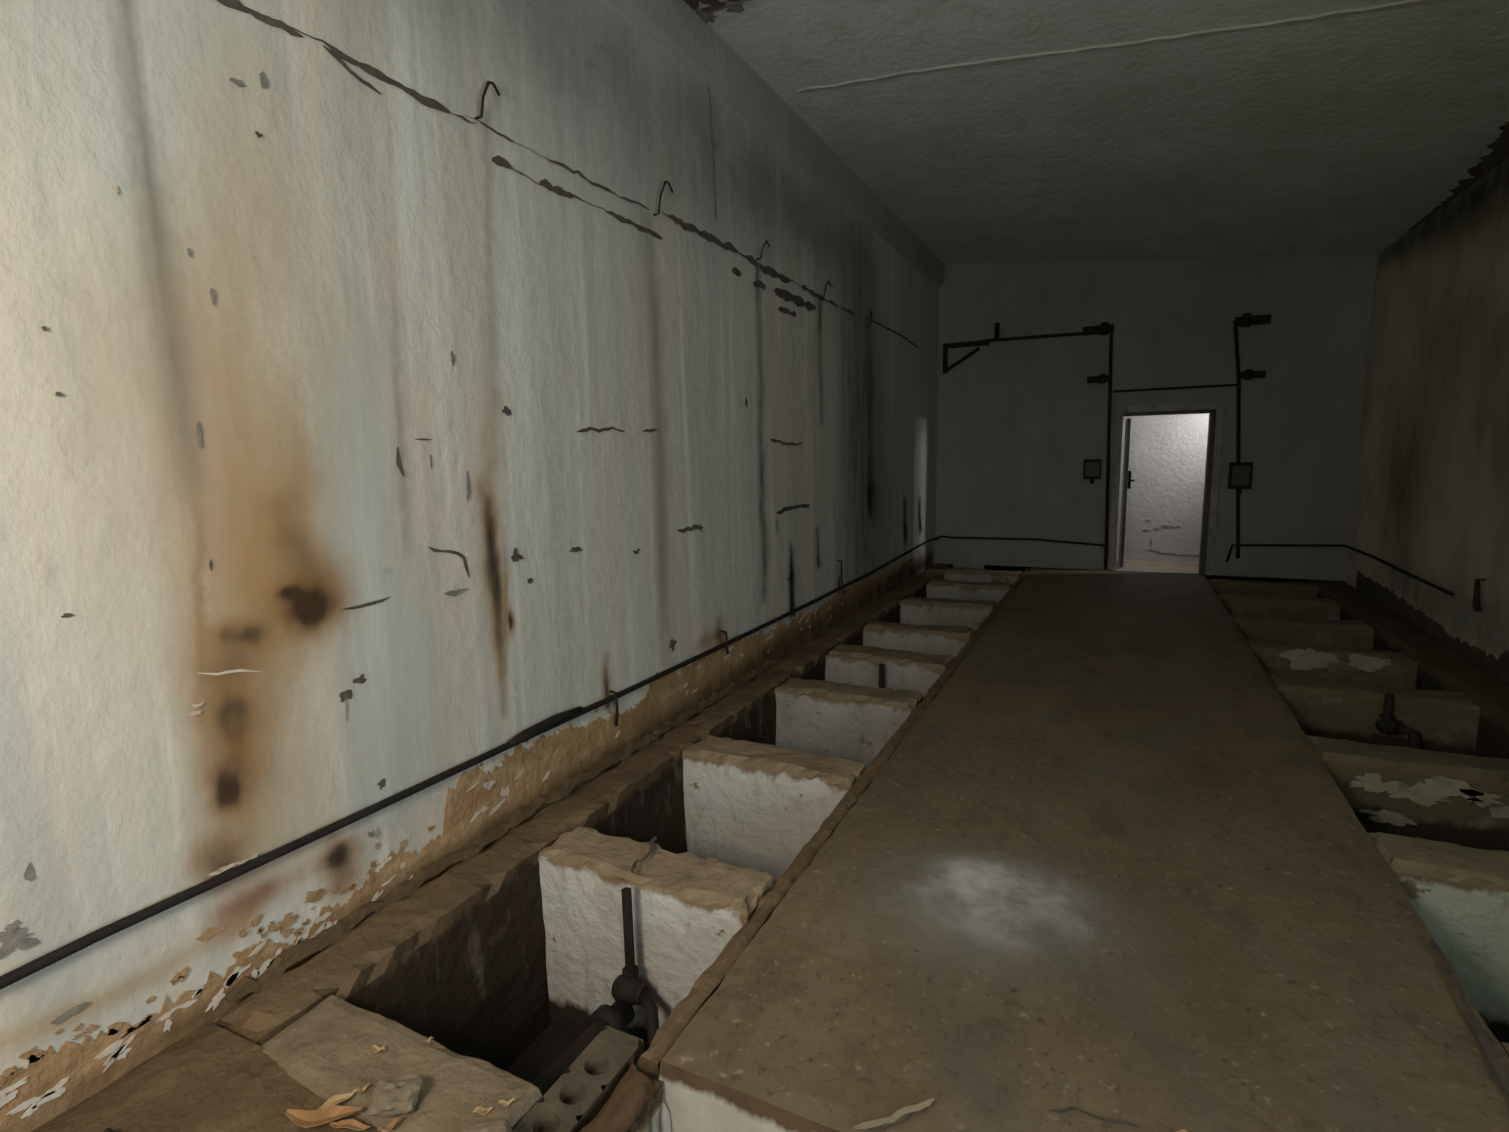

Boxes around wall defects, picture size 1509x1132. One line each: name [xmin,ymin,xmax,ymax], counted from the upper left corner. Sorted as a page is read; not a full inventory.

rust [179,339,340,812]
rust [483,495,514,658]
rust [203,841,238,877]
rust [323,841,353,886]
peeling [0,554,933,1132]
water stain [917,858,1085,946]